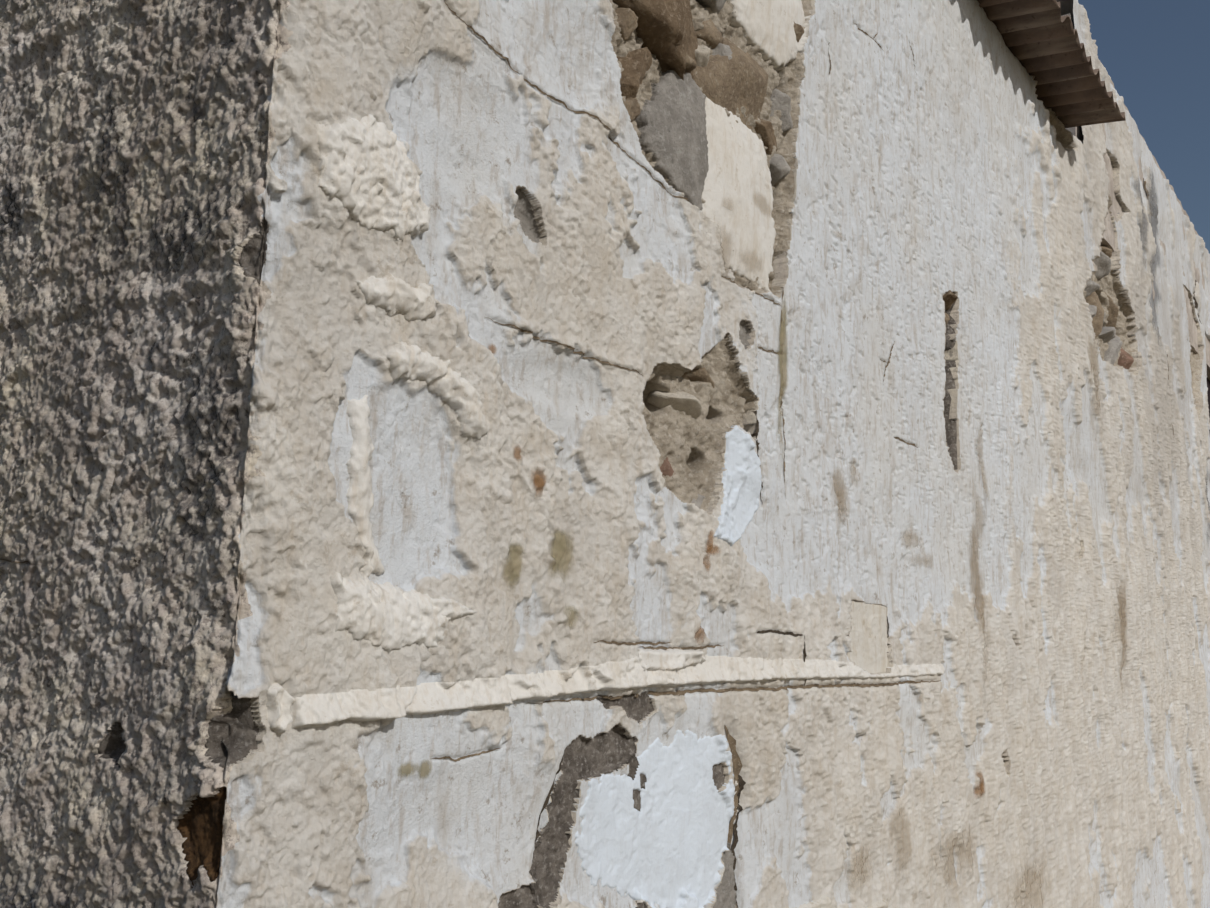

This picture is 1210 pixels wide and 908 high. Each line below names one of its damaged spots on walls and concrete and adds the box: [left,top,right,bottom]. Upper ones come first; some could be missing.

crack [445,2,689,202]
spalling [610,0,813,295]
crack [485,317,643,376]
spalling [642,321,762,546]
spalling [943,290,958,470]
spalling [1083,245,1138,372]
spalling [177,786,227,888]
crack [430,748,500,762]
crack [535,759,563,842]
flaking render [498,691,654,908]
crack [725,725,746,907]
crack [533,630,941,704]